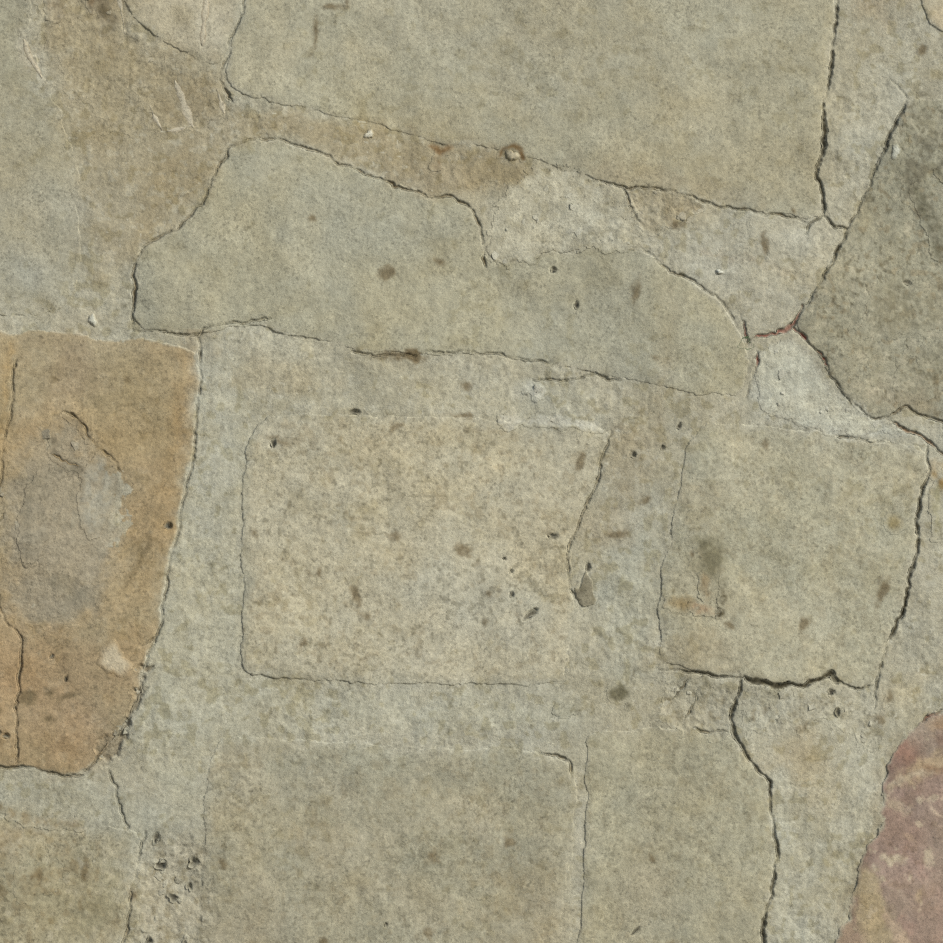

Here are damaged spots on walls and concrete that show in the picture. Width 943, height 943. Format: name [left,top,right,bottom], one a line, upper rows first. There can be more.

crack [220,0,244,102]
crack [352,350,621,382]
crack [0,138,486,943]
crack [566,432,612,599]
crack [601,0,943,943]
crack [539,753,572,775]